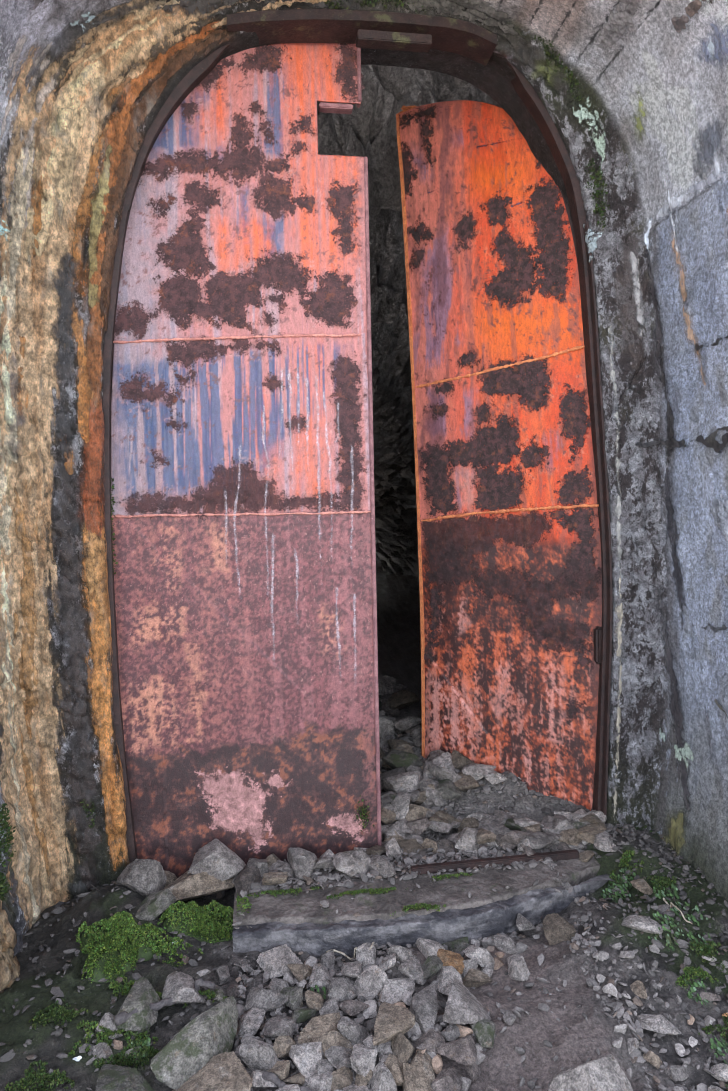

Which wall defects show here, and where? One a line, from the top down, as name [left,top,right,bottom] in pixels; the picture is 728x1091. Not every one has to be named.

corrosion [0,0,233,933]